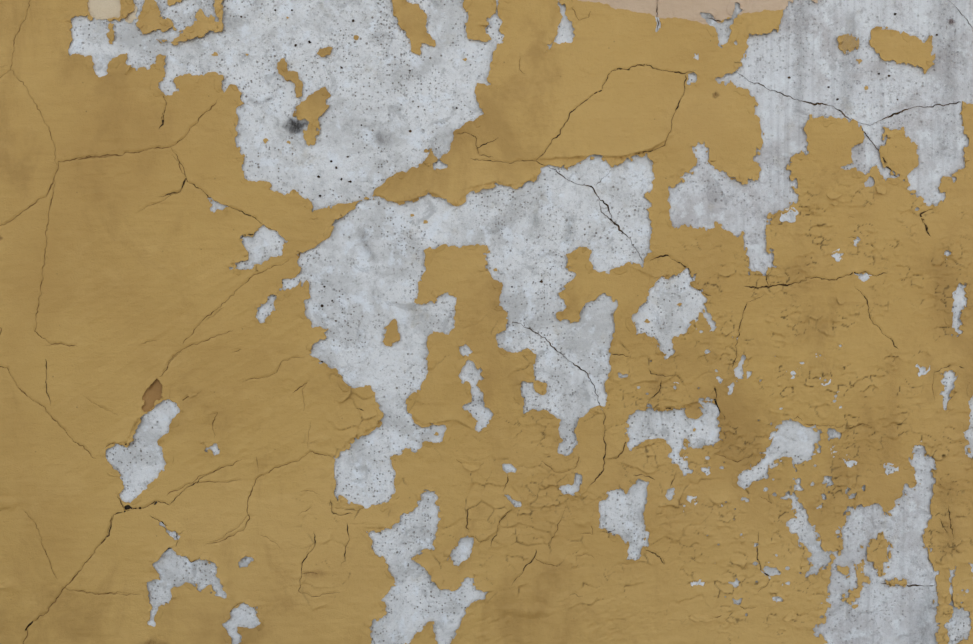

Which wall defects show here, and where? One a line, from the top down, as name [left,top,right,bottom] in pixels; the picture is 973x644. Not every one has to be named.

crack [0,1,293,459]
crack [23,383,329,642]
peeling [65,0,725,644]
crack [466,466,519,543]
crack [514,510,565,581]
crack [458,64,711,296]
peeling [715,352,762,395]
peeling [664,0,973,276]
peeling [720,408,973,644]
crack [738,73,959,177]
peeling [916,362,973,459]
peeling [944,281,970,337]